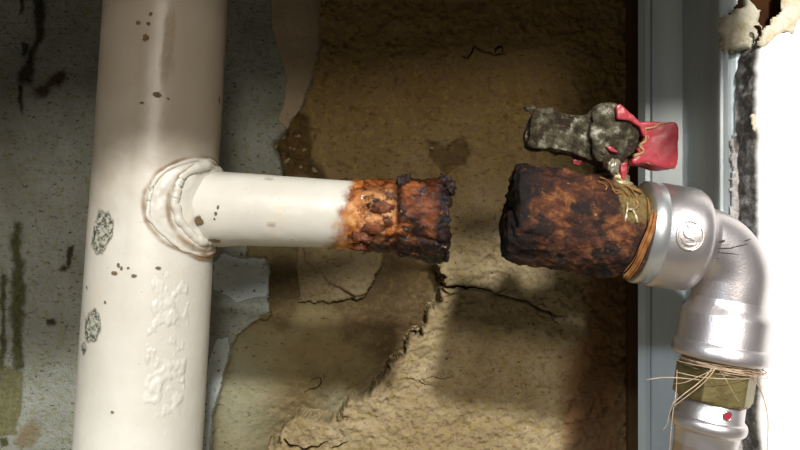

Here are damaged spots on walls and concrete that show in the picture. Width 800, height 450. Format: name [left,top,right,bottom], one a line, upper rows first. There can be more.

leakage [18,0,66,111]
peeling [271,0,325,179]
peeling [718,0,800,53]
peeling [730,104,741,221]
leakage [0,224,25,446]
spalling [203,246,444,450]
crack [440,283,564,324]
crack [283,438,349,450]